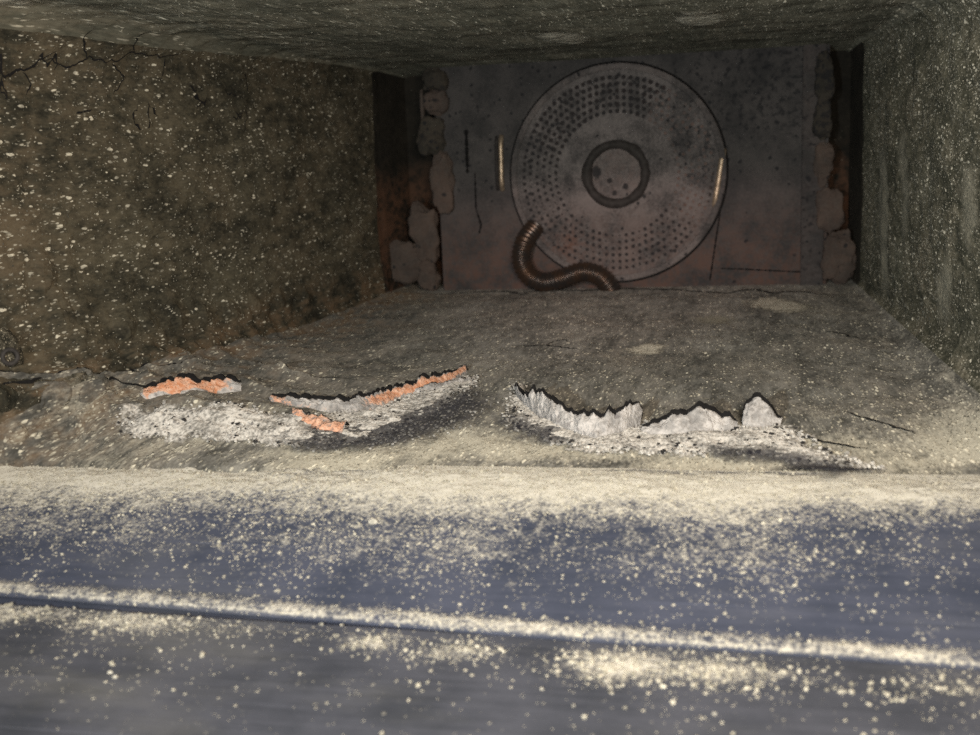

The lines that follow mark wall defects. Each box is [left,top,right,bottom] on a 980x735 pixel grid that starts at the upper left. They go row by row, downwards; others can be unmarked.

crack [0,30,186,99]
crack [132,101,158,130]
crack [190,73,248,127]
peeling [117,364,483,451]
peeling [502,383,867,474]